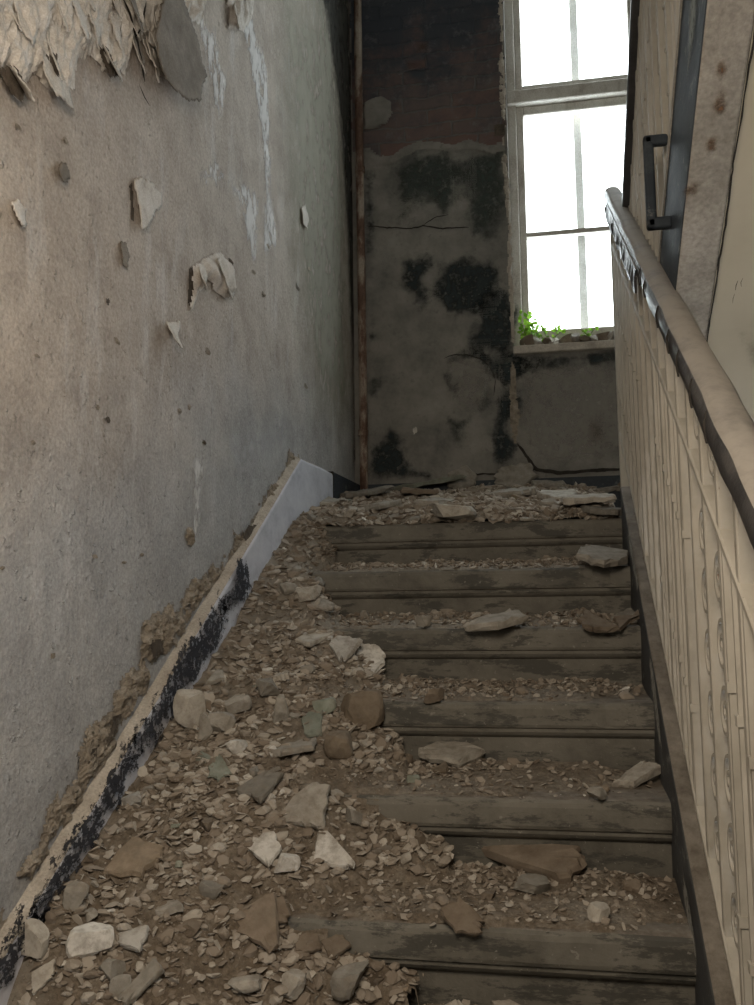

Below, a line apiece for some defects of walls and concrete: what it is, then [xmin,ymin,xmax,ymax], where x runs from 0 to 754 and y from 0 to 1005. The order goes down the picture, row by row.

peeling [226,0,254,33]
peeling [0,0,207,109]
peeling [11,199,28,227]
peeling [129,176,162,230]
crack [369,215,469,229]
flaking render [349,0,516,343]
mould [398,152,505,237]
peeling [188,252,237,310]
peeling [166,320,183,349]
water stain [403,257,568,464]
mould [371,431,430,477]
flaking render [0,449,300,989]